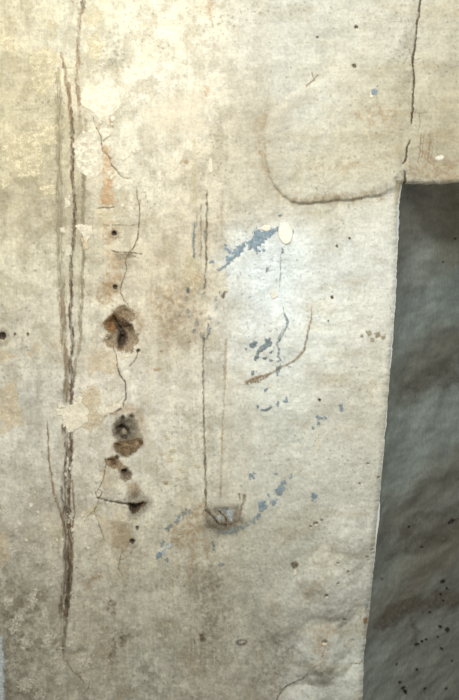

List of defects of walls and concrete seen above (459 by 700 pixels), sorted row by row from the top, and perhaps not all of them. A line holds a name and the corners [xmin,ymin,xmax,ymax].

crack [411,0,421,124]
crack [402,139,422,184]
crack [93,118,141,300]
crack [106,346,138,416]
crack [84,465,130,538]